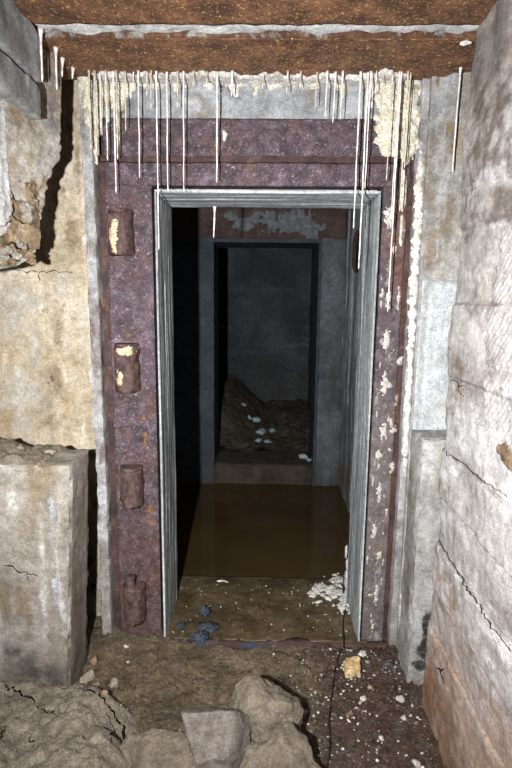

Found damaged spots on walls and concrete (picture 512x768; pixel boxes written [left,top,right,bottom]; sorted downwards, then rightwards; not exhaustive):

spalling [0,101,41,267]
peeling [224,208,326,239]
leakage [77,68,437,503]
crack [446,451,507,497]
leakage [307,545,350,614]
crack [439,540,512,652]
leakage [412,613,431,671]